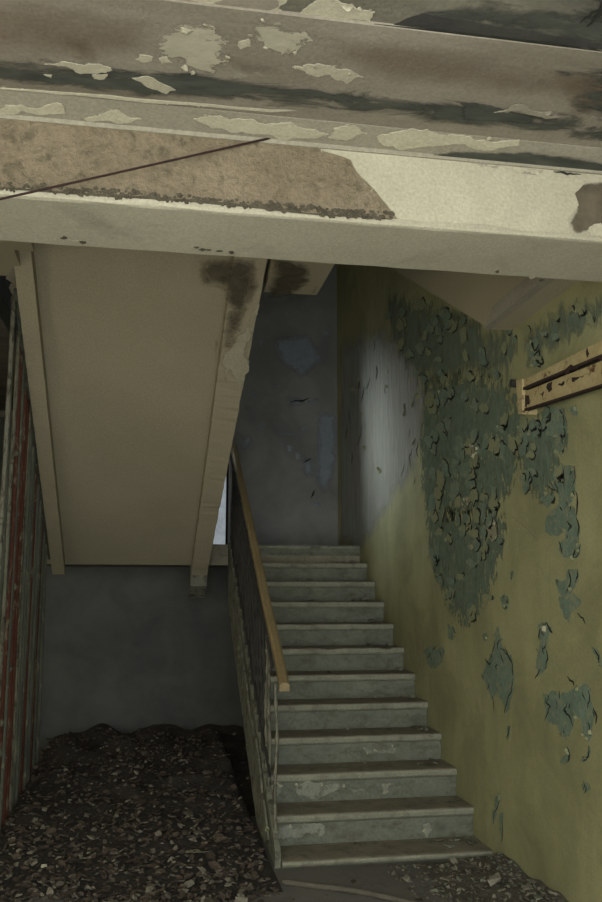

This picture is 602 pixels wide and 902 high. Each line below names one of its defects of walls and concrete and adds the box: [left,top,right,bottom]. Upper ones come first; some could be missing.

peeling [44,61,112,80]
peeling [135,0,361,84]
peeling [300,0,374,22]
crack [376,3,602,52]
flaking render [0,76,584,233]
peeling [588,223,602,237]
leakage [202,263,256,332]
peeling [523,302,602,368]
peeling [481,627,514,713]
peeling [535,622,552,678]
peeling [542,677,597,764]